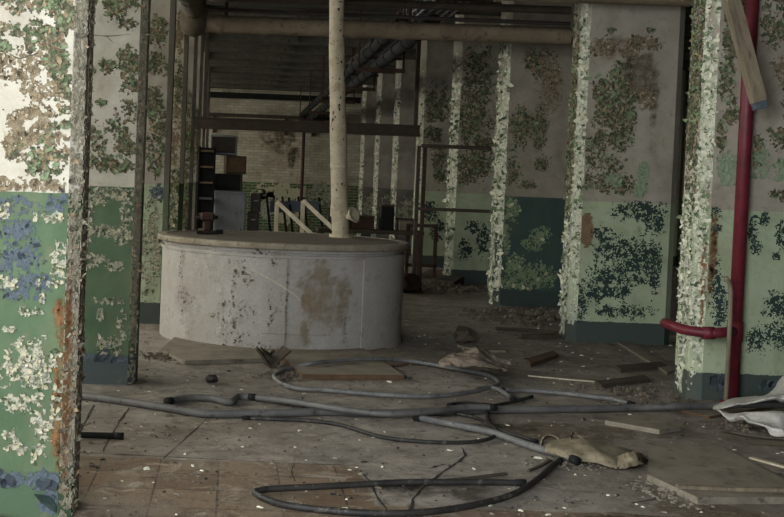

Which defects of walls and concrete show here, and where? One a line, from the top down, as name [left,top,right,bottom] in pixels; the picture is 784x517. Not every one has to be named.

rust [51,269,73,477]
peeling [0,0,200,517]
peeling [357,0,740,392]
peeling [745,289,784,356]
peeling [747,211,784,260]
peeling [750,0,784,203]